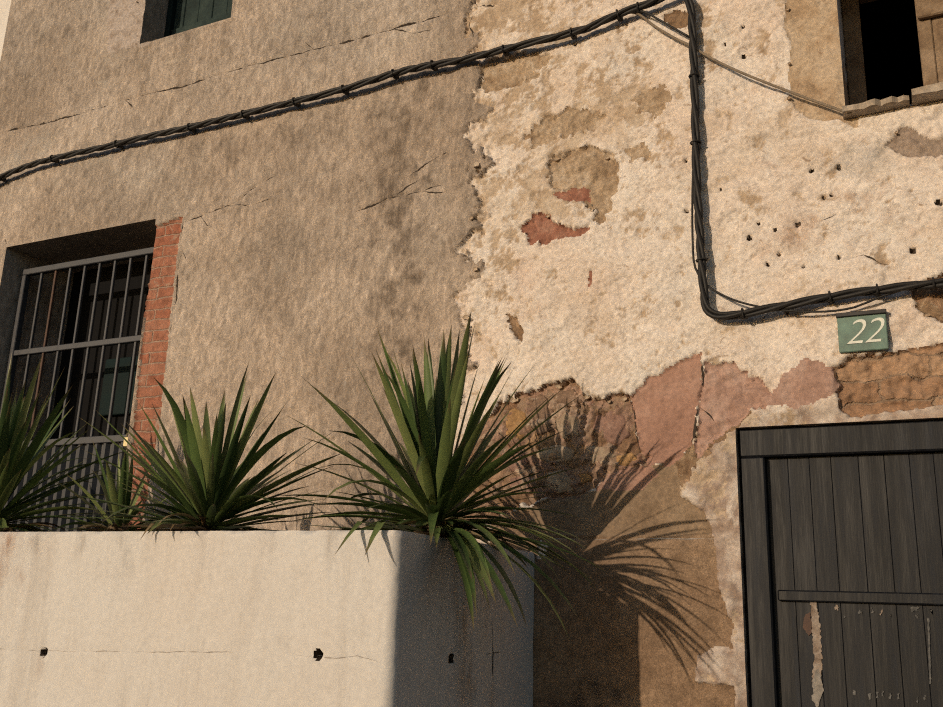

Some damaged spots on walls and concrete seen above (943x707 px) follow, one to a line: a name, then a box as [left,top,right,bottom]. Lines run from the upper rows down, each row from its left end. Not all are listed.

flaking render [783,0,860,128]
crack [358,152,446,211]
spalling [433,0,554,389]
spalling [520,106,651,245]
spalling [885,126,943,158]
spalling [458,342,943,537]
crack [688,359,714,453]